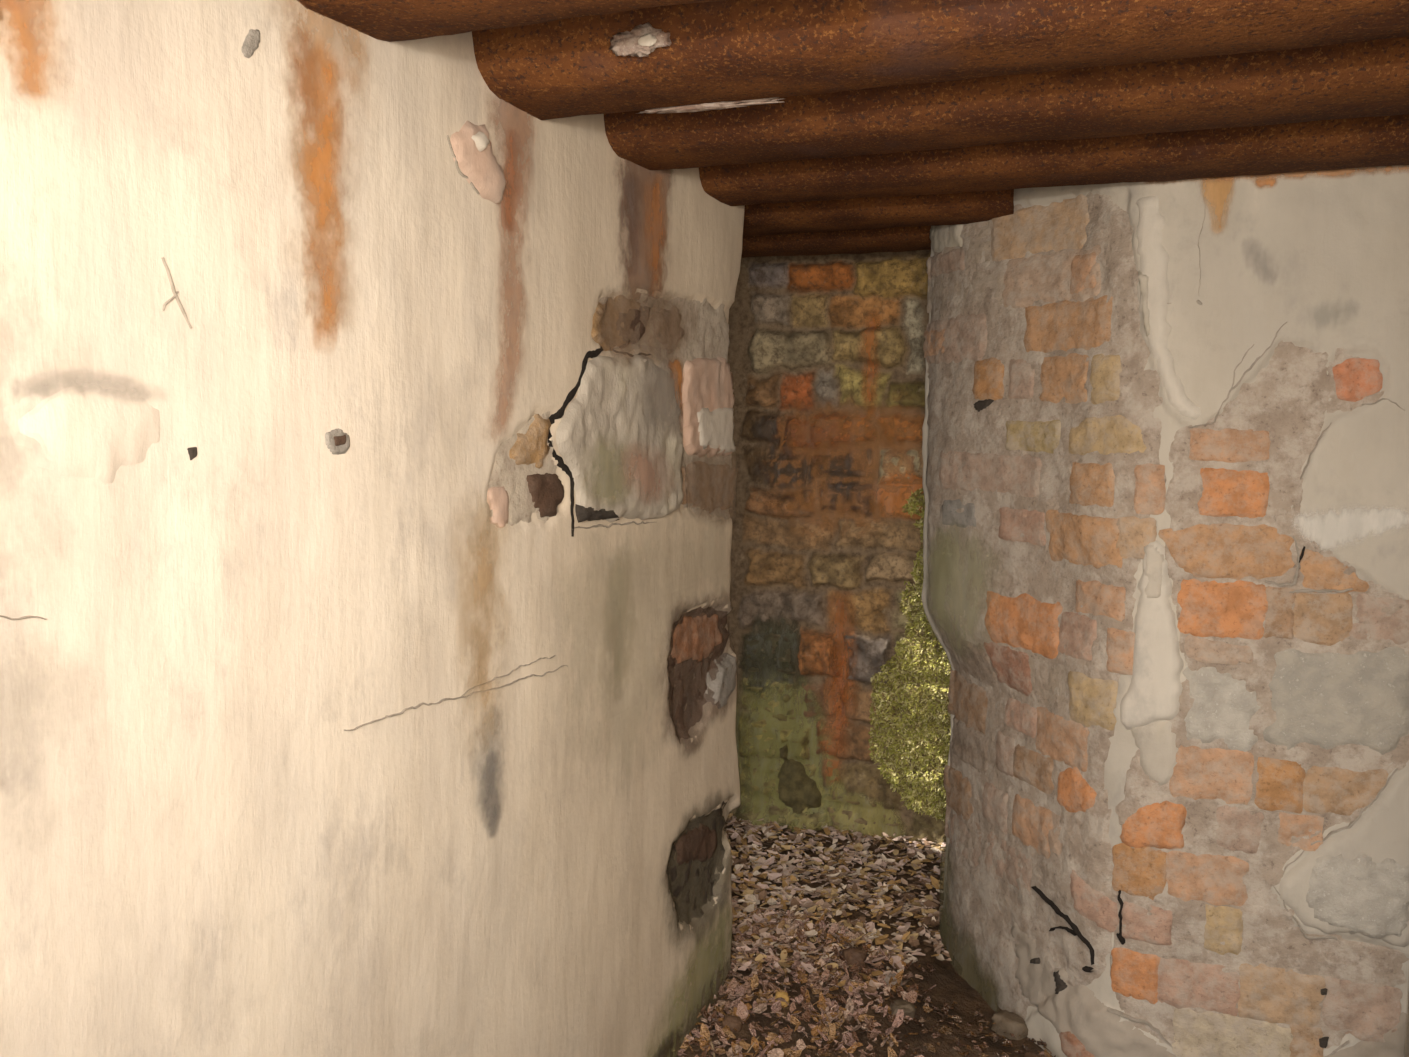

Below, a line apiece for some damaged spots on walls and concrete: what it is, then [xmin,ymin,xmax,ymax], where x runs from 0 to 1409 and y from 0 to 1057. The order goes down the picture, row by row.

rust [609,22,672,57]
rust [295,9,363,327]
rust [618,159,672,298]
rust [1200,166,1409,229]
flaking render [487,411,564,528]
flaking render [591,293,736,519]
crack [0,613,47,621]
flaking render [667,599,737,749]
flaking render [923,192,1409,1057]
flaking render [666,797,732,937]
crack [1031,886,1125,973]
crack [1107,1008,1178,1053]